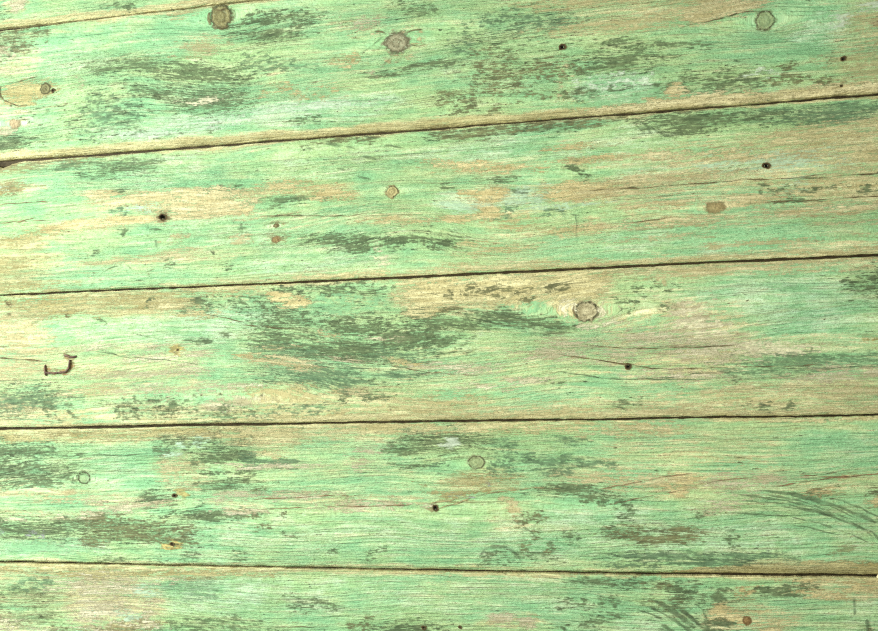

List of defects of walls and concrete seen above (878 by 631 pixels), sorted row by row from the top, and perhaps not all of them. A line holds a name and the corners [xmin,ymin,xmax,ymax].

peeling [556,63,878,115]
peeling [0,117,878,567]
peeling [0,549,287,631]
peeling [282,595,343,614]
peeling [345,614,375,631]
peeling [557,595,623,631]
peeling [664,560,878,631]